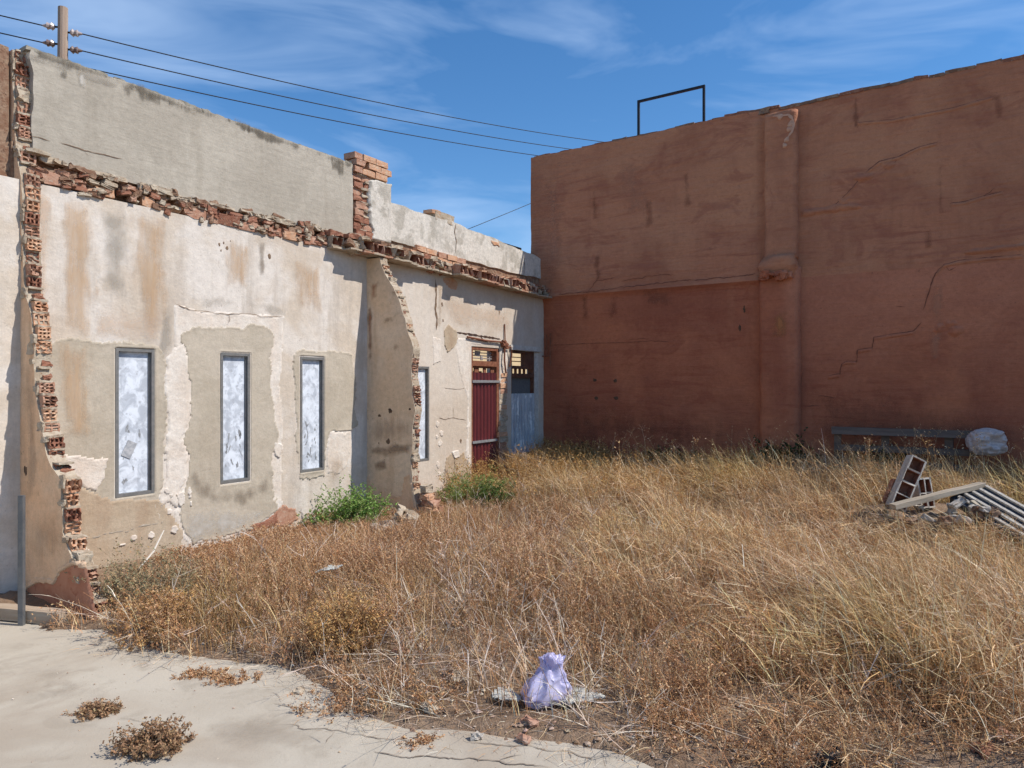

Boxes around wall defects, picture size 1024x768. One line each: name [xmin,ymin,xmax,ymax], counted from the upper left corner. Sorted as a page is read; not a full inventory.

flaking render [9,49,358,621]
spalling [379,257,416,337]
crack [565,273,755,294]
crack [808,254,1023,407]
spalling [389,352,422,513]